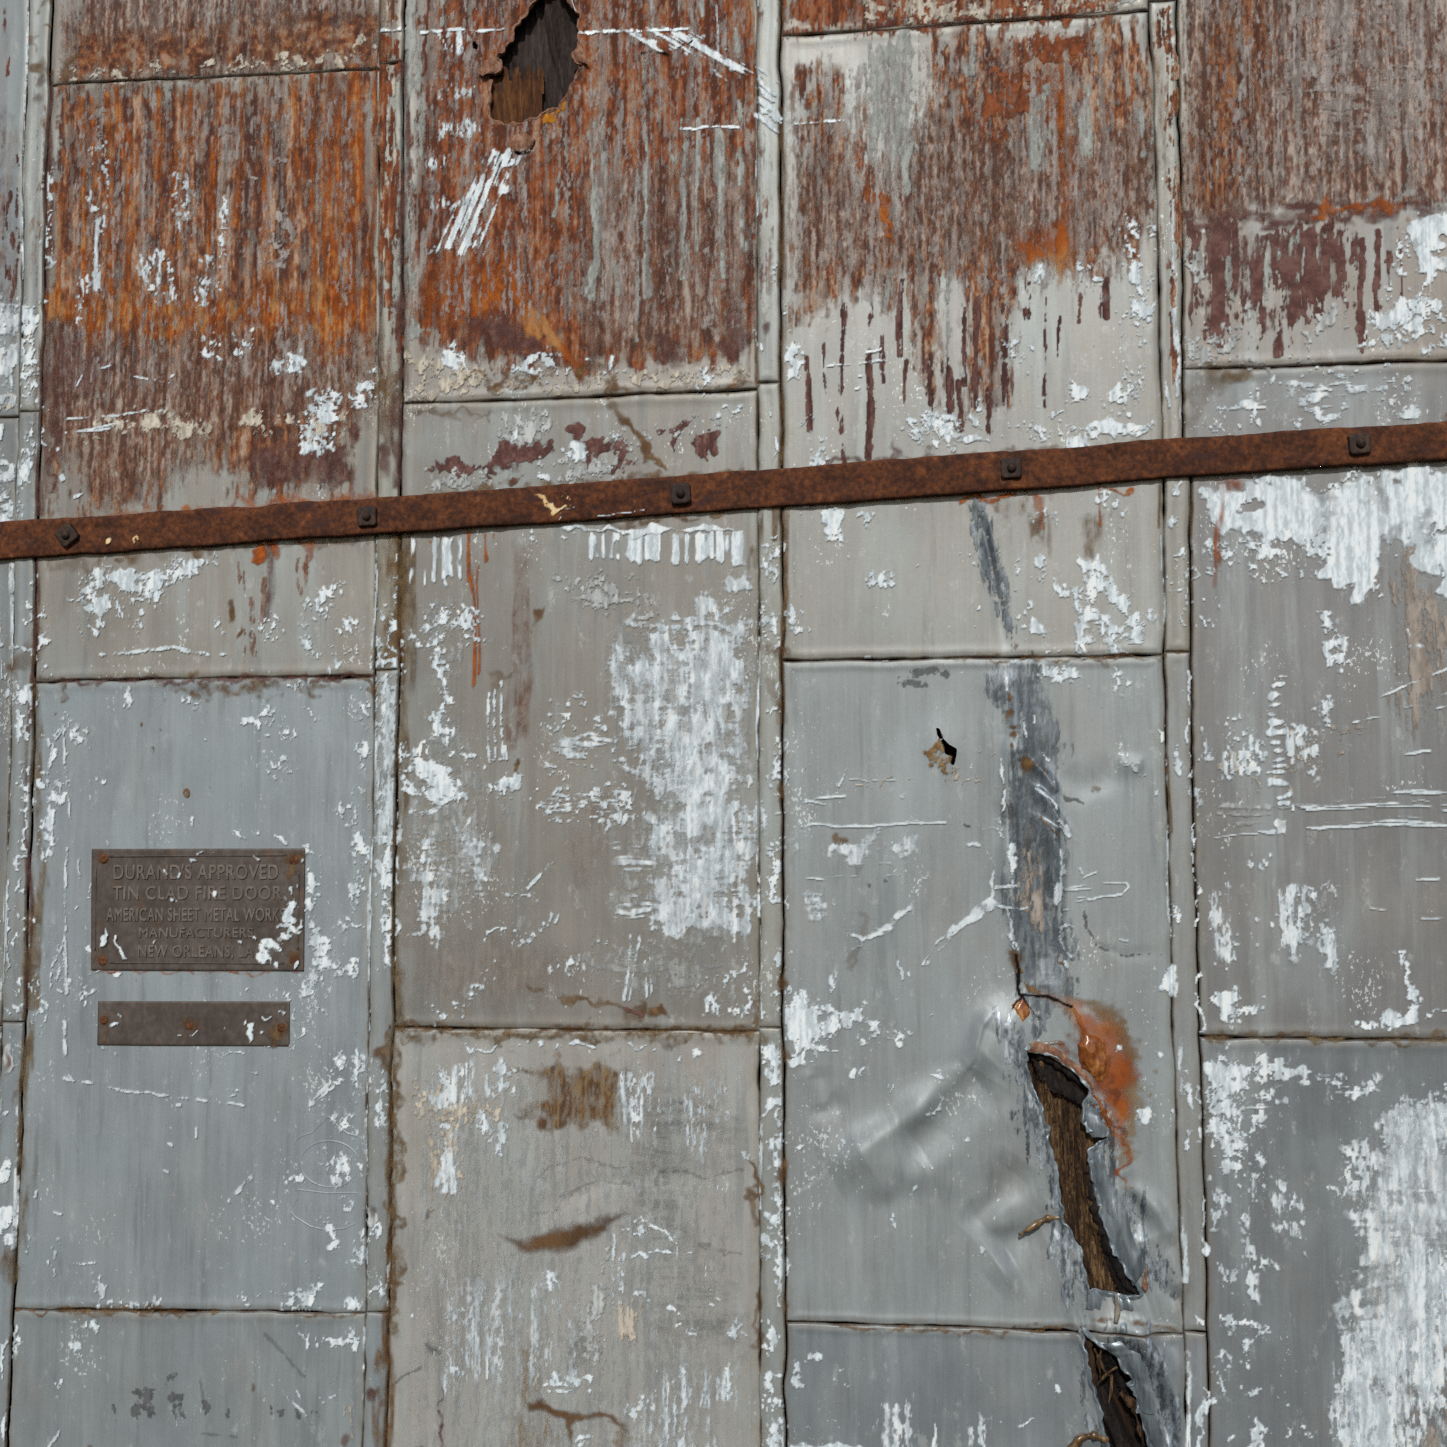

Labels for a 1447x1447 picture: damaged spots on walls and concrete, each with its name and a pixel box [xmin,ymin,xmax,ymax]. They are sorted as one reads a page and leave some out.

corrosion [2,187,20,302]
peeling [404,315,750,484]
peeling [381,0,783,342]
corrosion [30,0,1447,517]
corrosion [760,507,788,652]
peeling [959,461,1447,737]
corrosion [369,930,624,1447]
peeling [228,522,916,1447]
corrosion [627,1003,758,1046]
corrosion [1060,1001,1138,1188]
peeling [1156,671,1380,1304]
peeling [1227,1083,1447,1447]